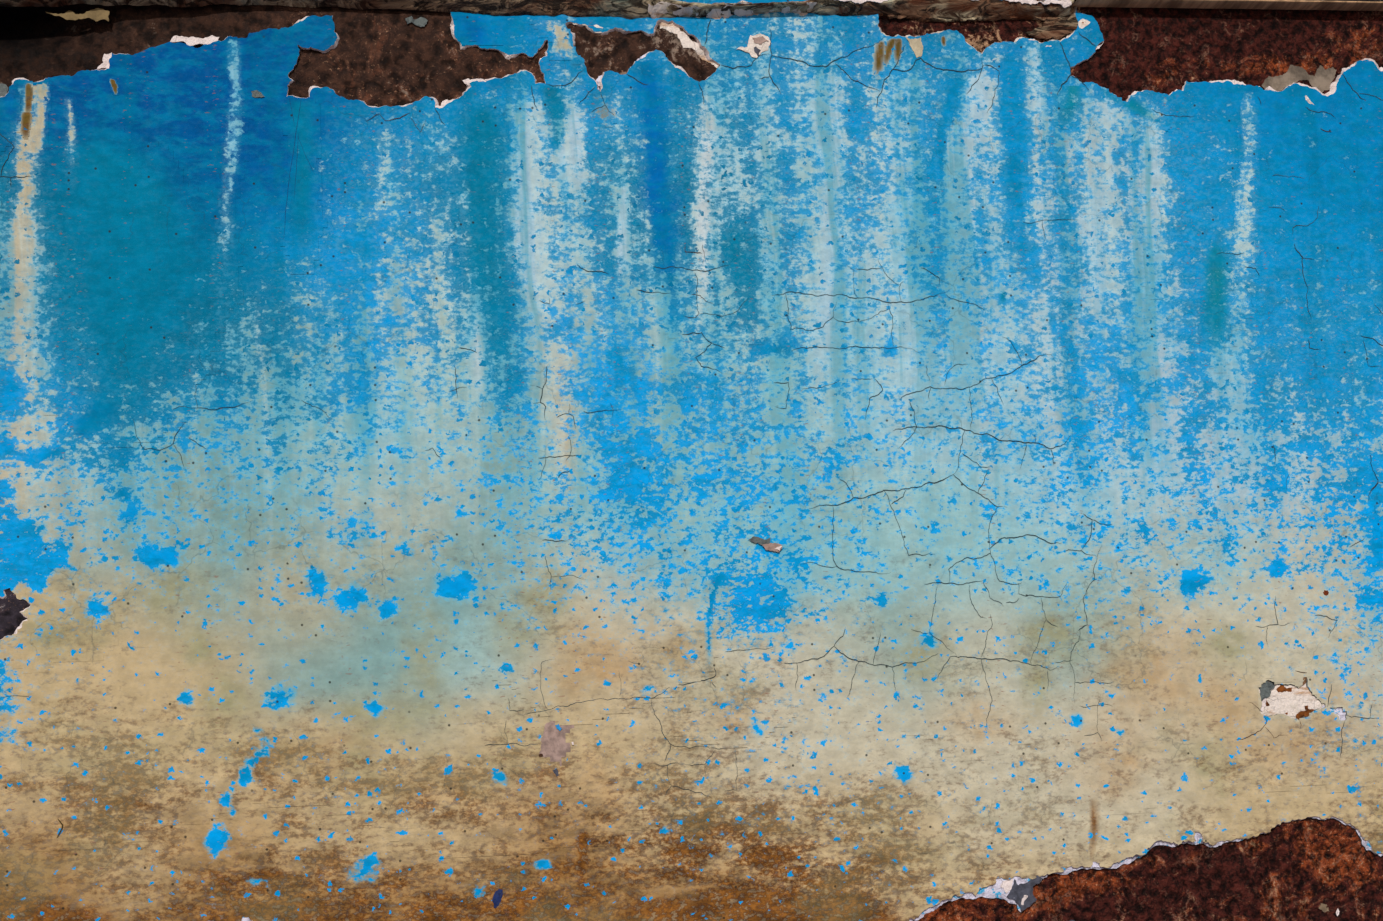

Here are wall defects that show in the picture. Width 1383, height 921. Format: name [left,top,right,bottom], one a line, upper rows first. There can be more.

rust [109,78,119,95]
peeling [0,3,548,108]
peeling [565,1,817,92]
peeling [839,0,1383,105]
leakage [0,37,253,448]
leakage [442,60,780,519]
leakage [794,69,854,453]
leakage [926,45,1174,362]
crack [487,245,1112,796]
peeling [0,588,31,640]
rust [607,834,956,921]
peeling [909,816,1383,921]